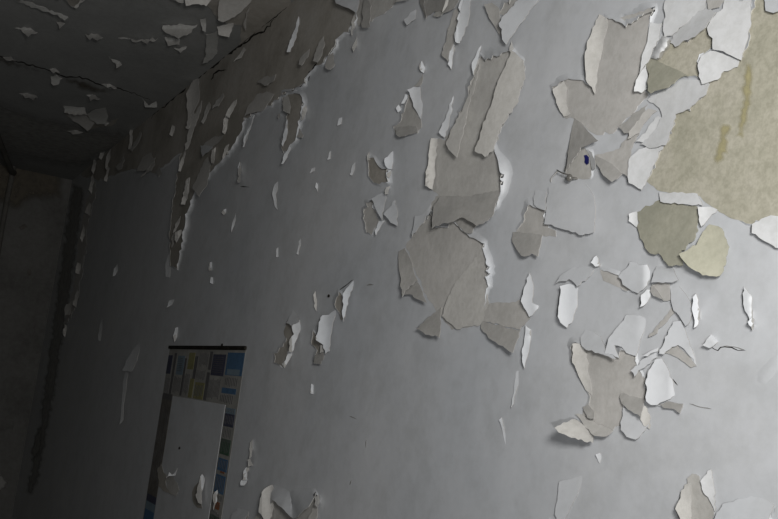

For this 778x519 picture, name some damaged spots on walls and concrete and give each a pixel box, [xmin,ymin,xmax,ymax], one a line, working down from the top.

crack [0,7,287,119]
peeling [392,61,425,137]
peeling [63,0,406,337]
peeling [398,0,539,368]
flaking render [512,0,778,443]
peeling [272,310,301,369]
peeling [309,280,354,365]
peeling [240,440,253,486]
peeling [230,485,320,519]
peeling [674,469,774,519]